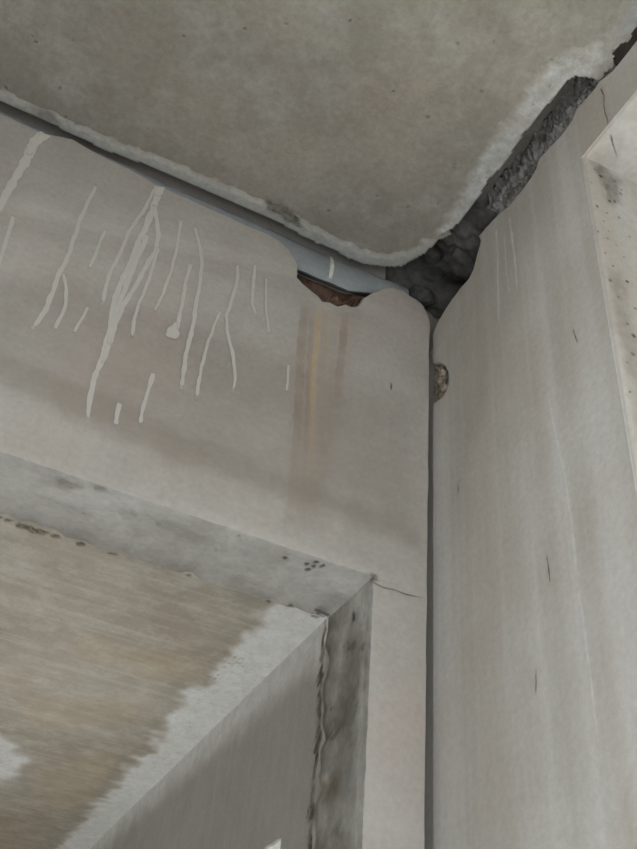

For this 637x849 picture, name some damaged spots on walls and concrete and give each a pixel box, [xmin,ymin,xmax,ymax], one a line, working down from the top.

damp [0,132,51,212]
damp [33,186,97,329]
damp [86,185,165,423]
damp [166,227,204,386]
damp [195,264,240,396]
spalling [297,274,365,307]
spalling [385,53,616,319]
damp [0,724,38,791]